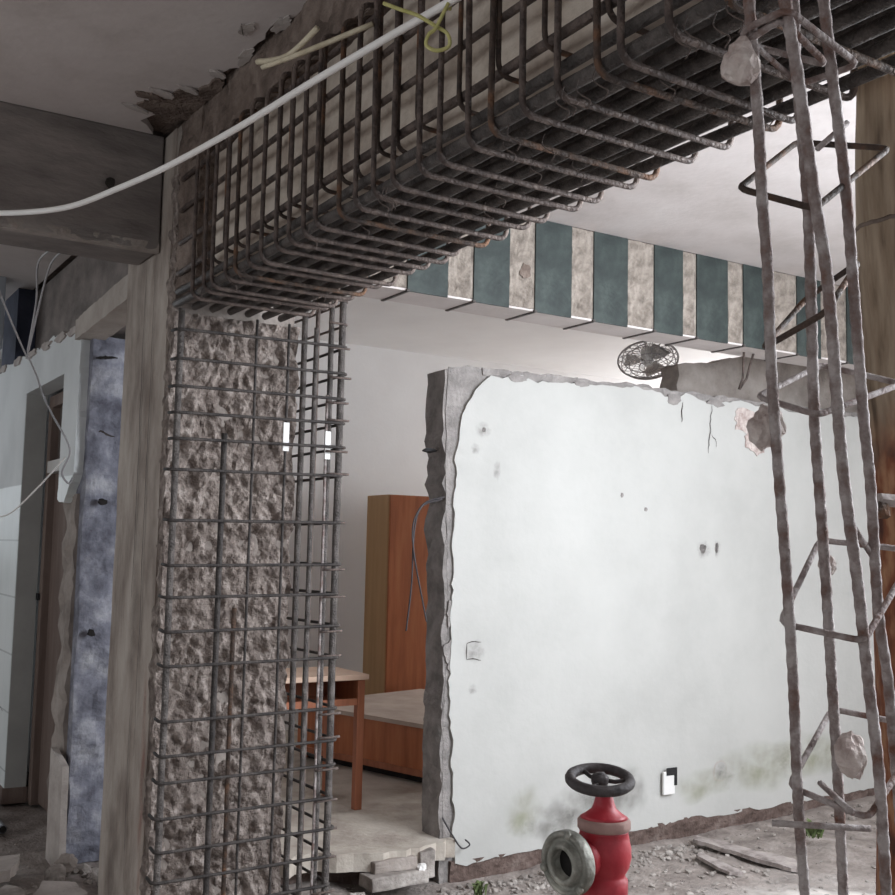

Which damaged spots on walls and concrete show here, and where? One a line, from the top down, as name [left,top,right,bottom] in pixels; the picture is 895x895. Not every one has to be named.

flaking render [121,0,374,162]
spalling [370,261,405,288]
spalling [448,234,471,299]
spalling [509,222,533,309]
spalling [571,227,592,319]
spalling [628,239,652,329]
spalling [683,252,695,336]
spalling [728,262,742,344]
spalling [774,271,796,353]
spalling [835,285,846,361]
spalling [139,173,301,895]
flaking render [422,367,768,839]